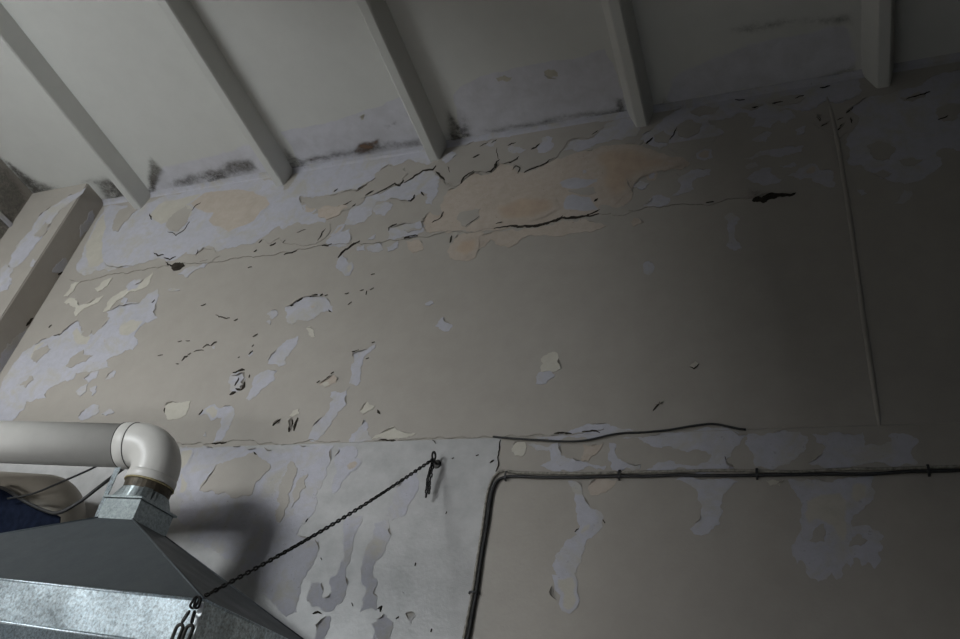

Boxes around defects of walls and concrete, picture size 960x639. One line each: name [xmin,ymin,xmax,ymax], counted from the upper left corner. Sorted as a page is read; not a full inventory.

water stain [146,142,267,192]
water stain [278,96,422,168]
spalling [752,192,796,203]
crack [71,209,600,282]
peeling [0,121,690,421]
peeling [163,293,419,639]
peeling [512,423,919,614]